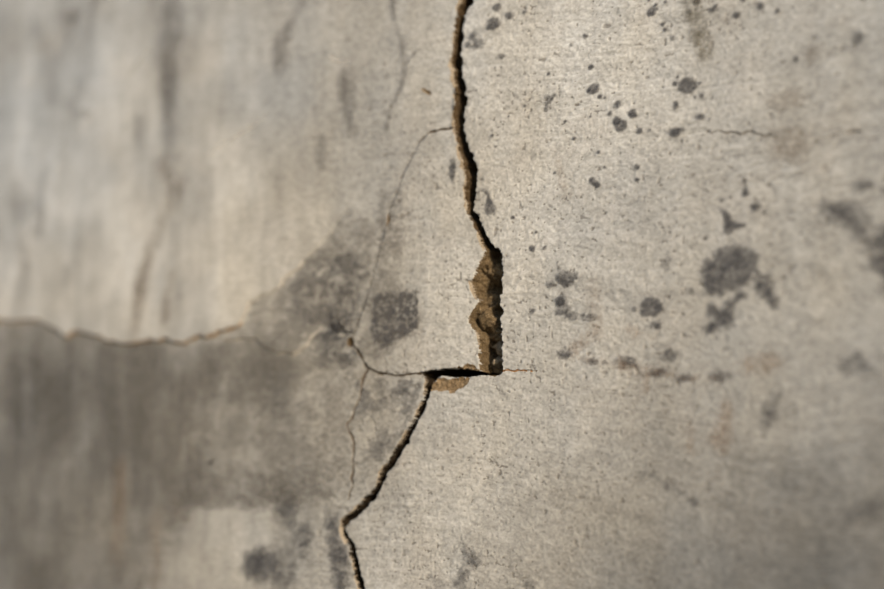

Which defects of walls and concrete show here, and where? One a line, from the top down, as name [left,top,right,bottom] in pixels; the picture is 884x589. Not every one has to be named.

damp [587,84,637,131]
damp [673,76,703,98]
damp [721,197,745,234]
damp [370,291,418,347]
crack [339,0,537,589]
damp [704,247,776,333]
damp [245,552,281,579]
damp [328,520,347,589]